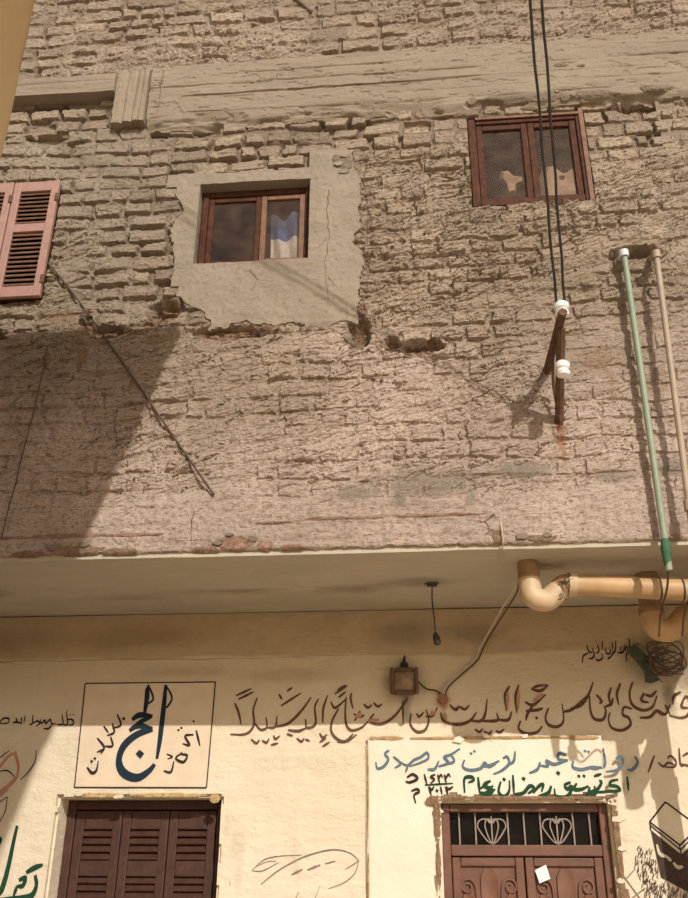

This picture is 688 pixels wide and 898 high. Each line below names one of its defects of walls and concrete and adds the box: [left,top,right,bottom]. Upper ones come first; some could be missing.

crack [323,190,338,304]
spalling [193,324,280,342]